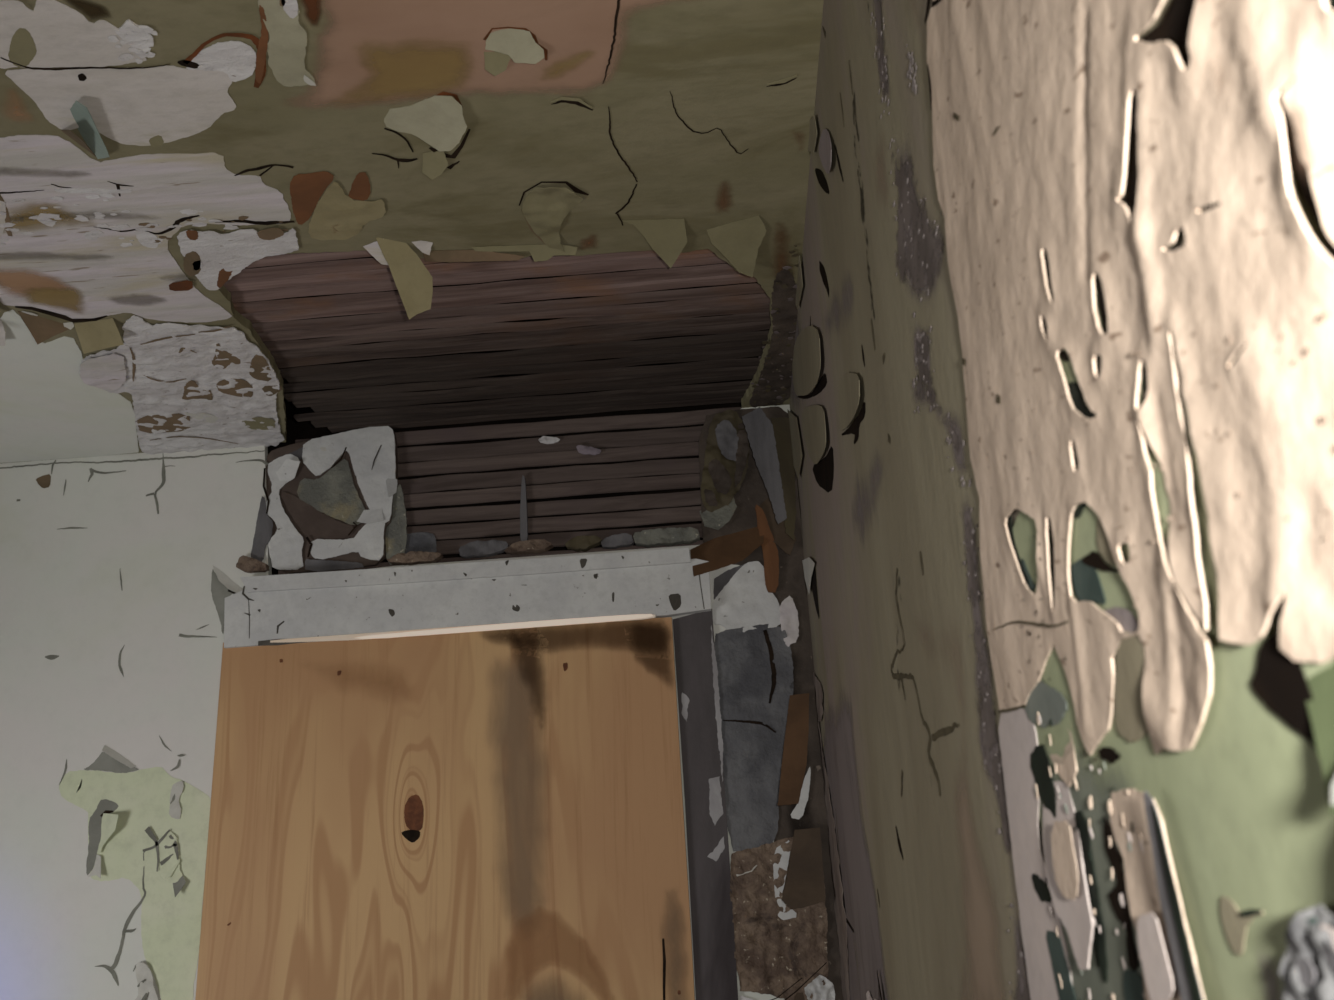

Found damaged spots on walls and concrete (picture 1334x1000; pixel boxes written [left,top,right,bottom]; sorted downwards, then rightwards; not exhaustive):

crack [602,0,638,226]
crack [670,92,748,154]
peeling [870,0,890,119]
peeling [0,0,865,647]
peeling [889,0,1334,1000]
peeling [86,799,119,879]
peeling [84,745,139,773]
peeling [143,754,186,897]
peeling [813,672,888,1000]
crack [891,571,959,797]